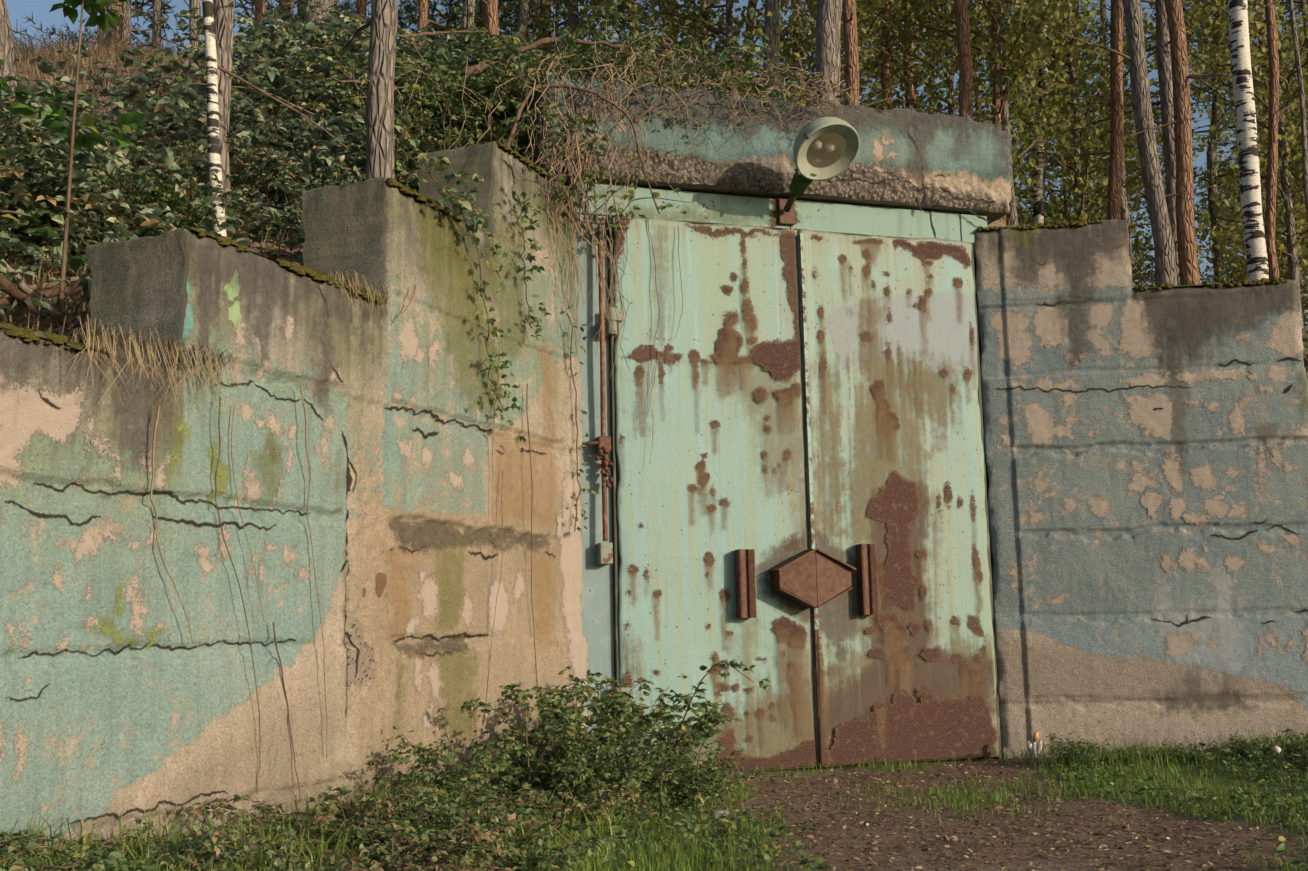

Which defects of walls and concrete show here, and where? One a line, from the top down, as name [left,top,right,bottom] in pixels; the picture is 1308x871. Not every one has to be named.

spalling [553,108,1008,212]
peeling [0,337,172,514]
crack [10,638,296,701]
crack [5,482,310,530]
crack [216,380,357,576]
crack [394,632,488,657]
peeling [390,470,588,736]
rust [626,564,662,599]
rust [623,197,824,474]
rust [687,237,998,772]
peeling [987,246,1308,575]
leakage [1137,280,1300,471]